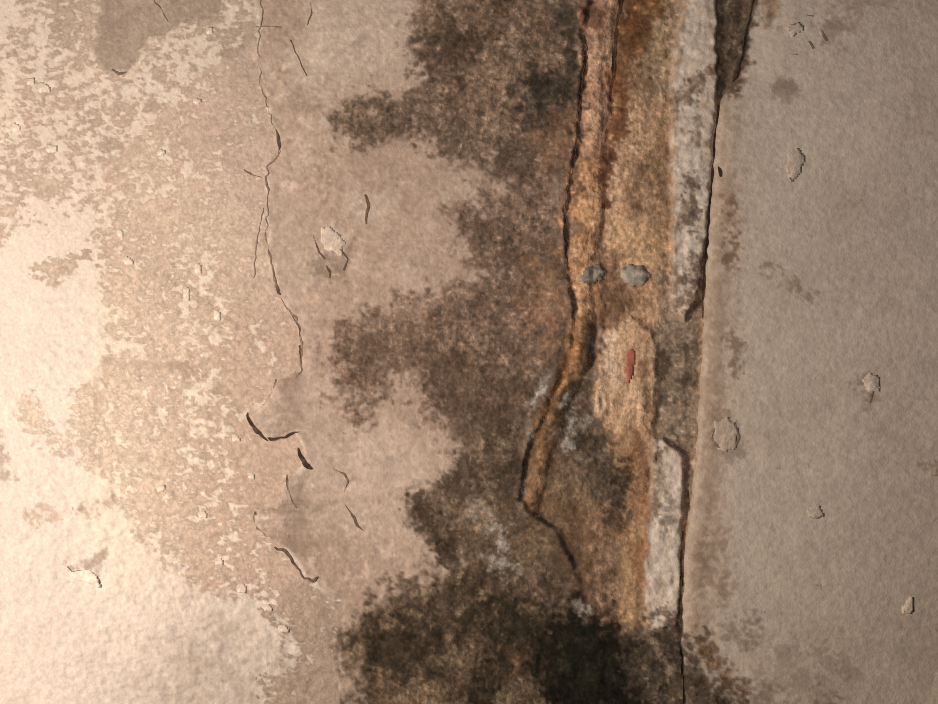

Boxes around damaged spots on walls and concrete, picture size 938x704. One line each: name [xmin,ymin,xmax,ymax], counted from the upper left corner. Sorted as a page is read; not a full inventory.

peeling [0,0,344,704]
crack [244,0,307,378]
flaking render [313,227,351,279]
crack [363,194,371,224]
damp [329,0,749,704]
rust [515,242,596,515]
rust [596,0,664,209]
crack [702,104,722,318]
damp [718,0,758,97]
crack [336,470,362,530]